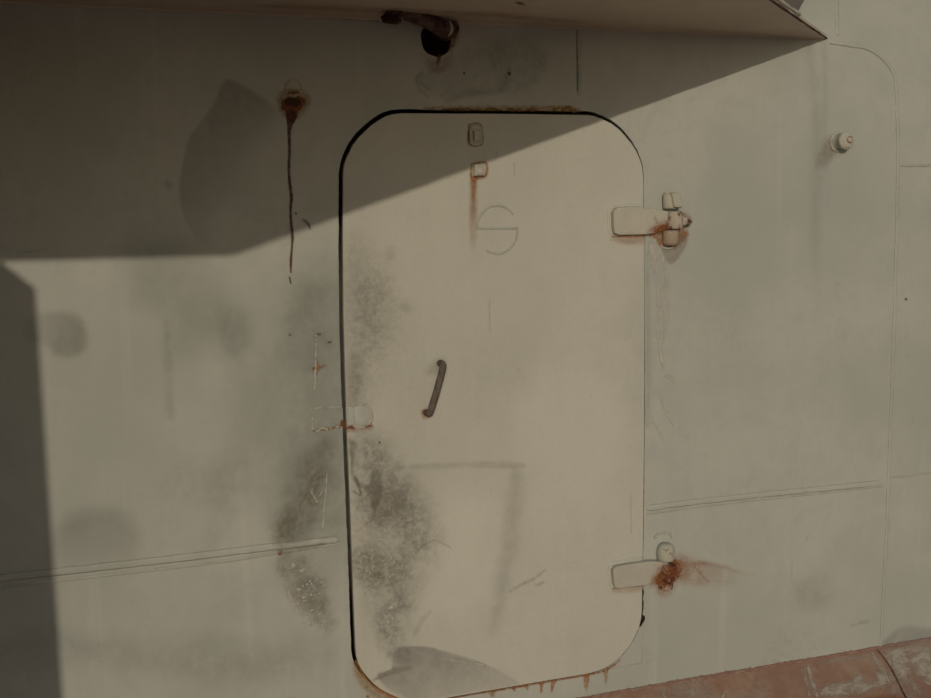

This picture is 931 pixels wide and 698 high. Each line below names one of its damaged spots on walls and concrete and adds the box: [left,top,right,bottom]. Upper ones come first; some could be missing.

rust [281,90,307,284]
rust [470,161,488,197]
rust [614,223,688,247]
rust [478,664,616,695]